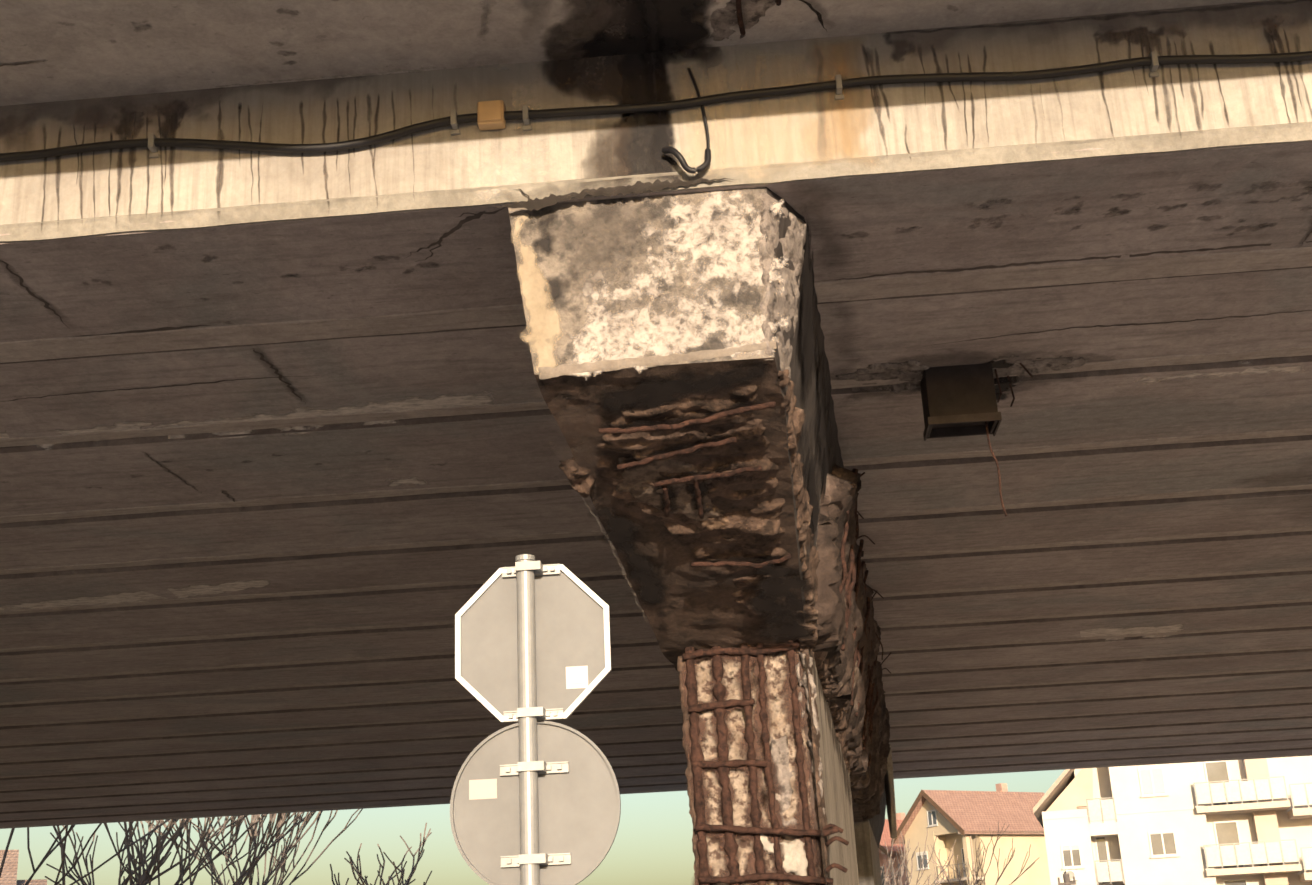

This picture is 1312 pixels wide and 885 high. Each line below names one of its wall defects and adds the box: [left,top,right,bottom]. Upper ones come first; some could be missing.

spalling [710,0,781,41]
water stain [544,0,721,183]
water stain [862,33,988,145]
water stain [1095,27,1204,133]
water stain [41,101,187,228]
crack [0,260,220,362]
crack [406,177,738,261]
spalling [835,360,930,394]
spalling [985,354,1089,407]
crack [817,244,1271,282]
crack [924,310,1312,347]
spalling [513,190,897,885]